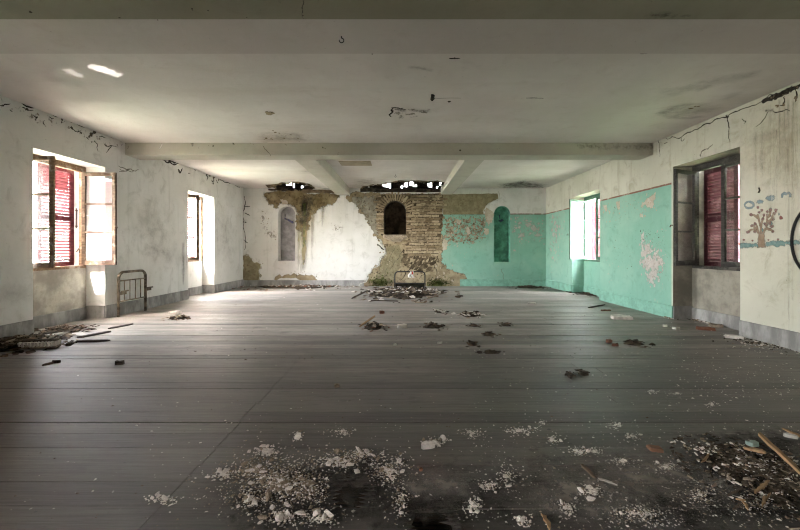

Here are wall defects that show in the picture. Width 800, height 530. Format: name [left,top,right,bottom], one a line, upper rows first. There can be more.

crack [0,104,138,172]
crack [658,84,800,157]
crack [164,160,250,250]
flaking render [243,254,263,280]
flaking render [346,191,500,286]
peeling [631,229,666,288]